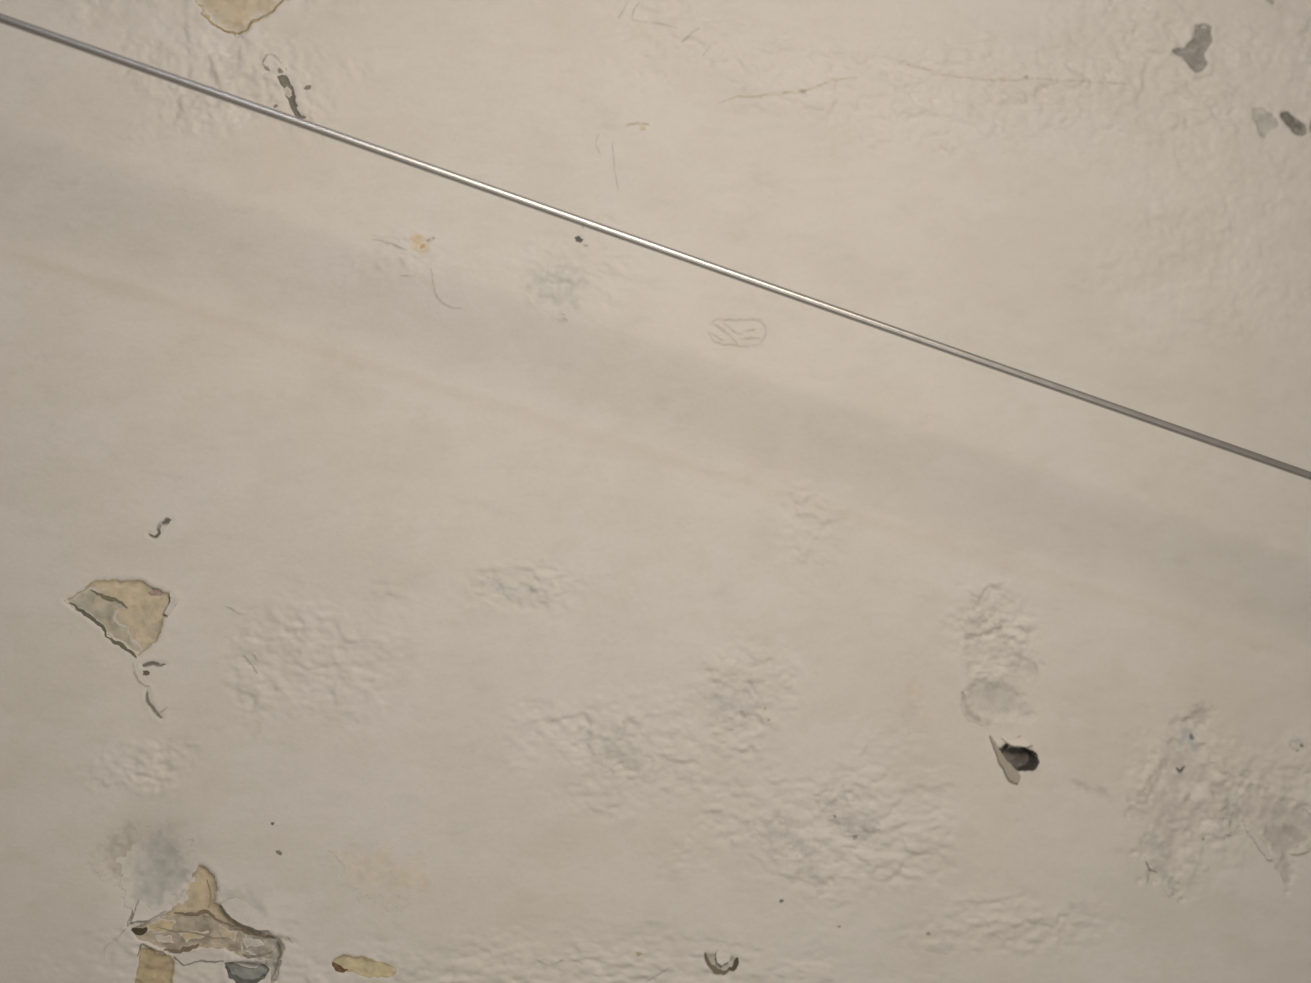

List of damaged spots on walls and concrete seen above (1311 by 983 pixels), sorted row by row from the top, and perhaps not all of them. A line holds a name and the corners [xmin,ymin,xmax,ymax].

peeling [196,0,289,37]
peeling [1172,23,1212,73]
peeling [1251,107,1311,139]
peeling [64,579,178,658]
peeling [960,671,1041,784]
peeling [103,865,294,983]
peeling [332,954,430,983]